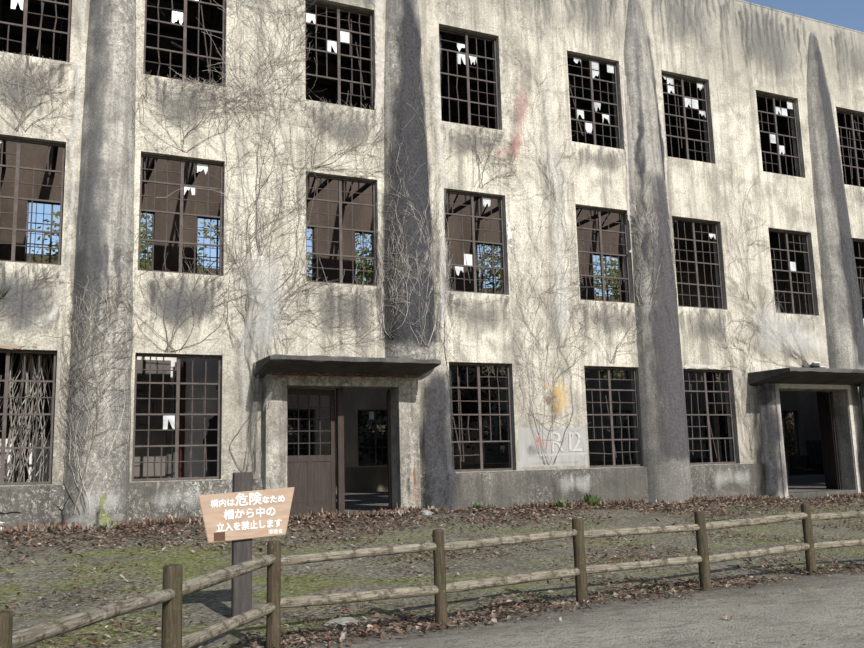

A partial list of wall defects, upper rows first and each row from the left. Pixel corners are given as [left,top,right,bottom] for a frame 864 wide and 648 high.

water stain [75,68,122,317]
water stain [152,276,215,322]
water stain [370,0,436,347]
water stain [636,107,646,189]
water stain [641,28,727,459]
water stain [657,0,864,365]